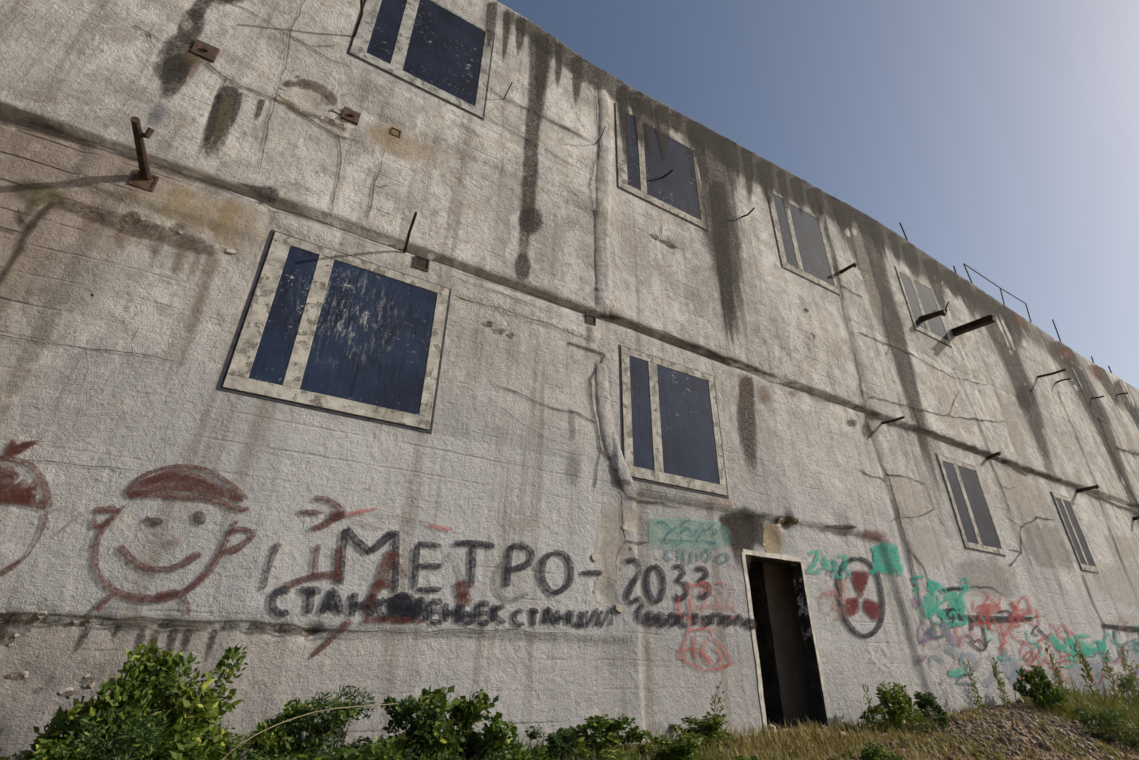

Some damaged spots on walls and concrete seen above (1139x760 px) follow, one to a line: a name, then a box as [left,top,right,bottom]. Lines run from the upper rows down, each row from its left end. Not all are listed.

leakage [155,0,243,96]
crack [0,0,415,255]
leakage [203,86,243,155]
crack [483,88,615,256]
crack [0,201,58,284]
leakage [486,2,1139,516]
crack [0,326,184,382]
crack [4,436,150,472]
crack [430,194,1139,632]
leakage [75,626,92,651]
leakage [136,628,193,655]
crack [0,612,568,634]